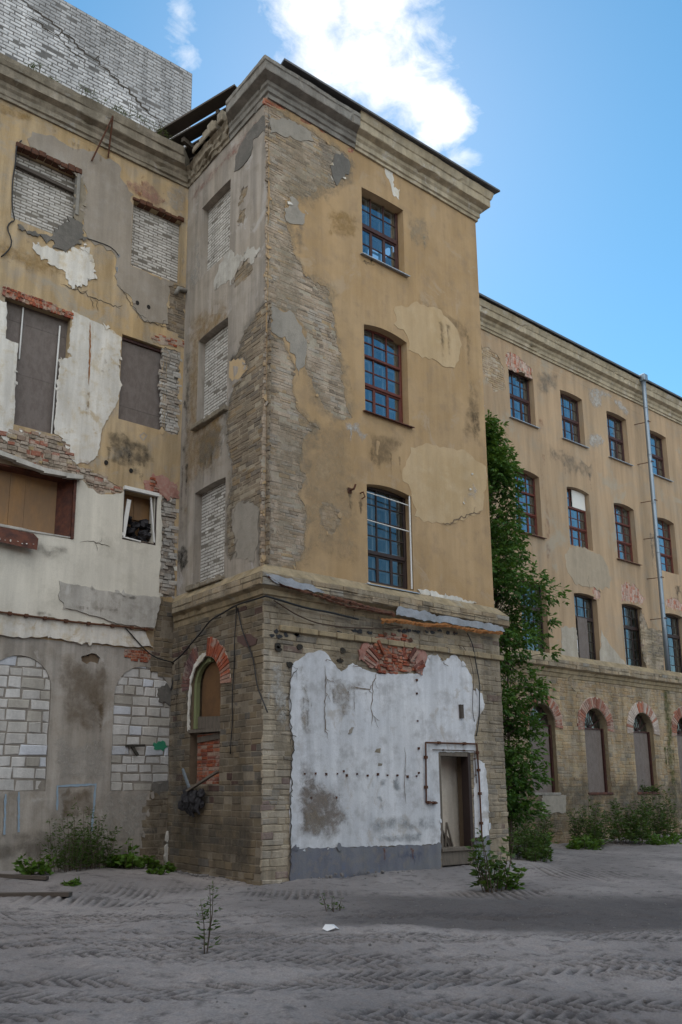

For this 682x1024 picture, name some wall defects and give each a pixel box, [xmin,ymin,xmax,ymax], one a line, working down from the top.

crack [23,0,165,128]
peeling [32,174,97,289]
spalling [213,97,365,569]
peeling [0,300,180,678]
crack [324,673,378,738]
peeling [275,632,491,851]